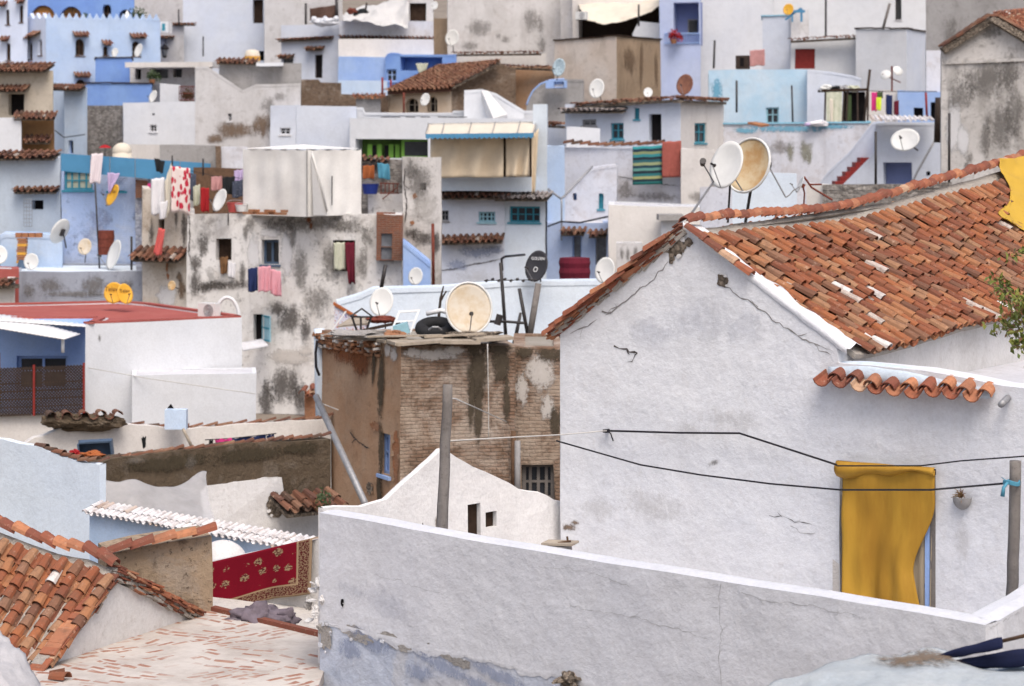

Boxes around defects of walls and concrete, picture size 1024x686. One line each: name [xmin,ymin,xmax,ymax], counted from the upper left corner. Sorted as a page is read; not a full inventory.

damp [946,56,1022,167]
damp [189,234,247,293]
damp [243,215,372,414]
crack [614,345,638,362]
crack [726,287,831,355]
damp [371,342,560,500]
peeling [439,654,470,669]